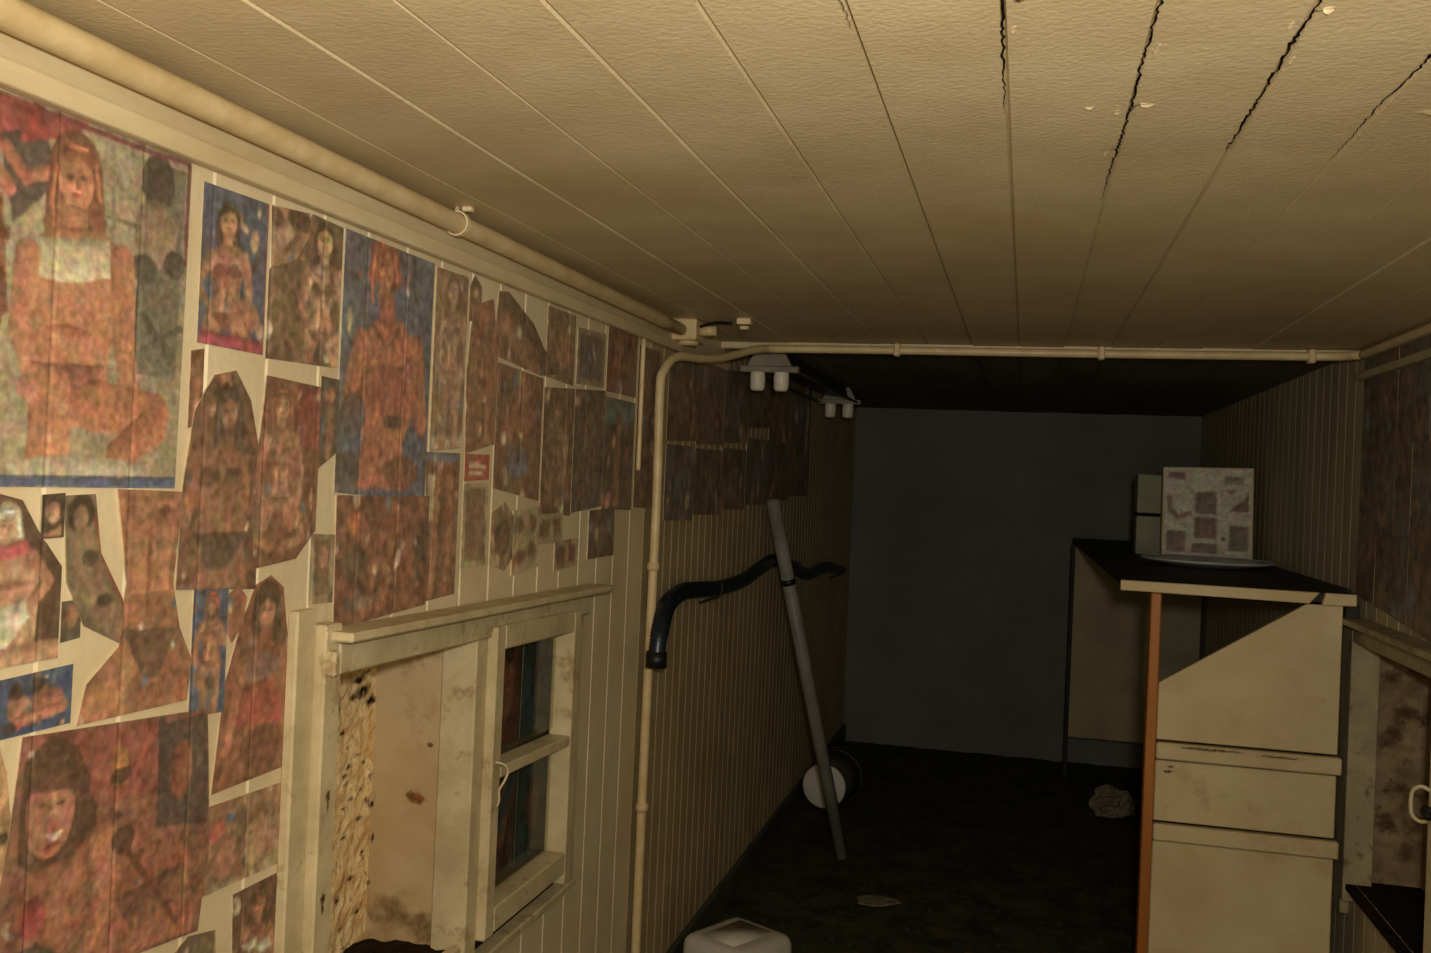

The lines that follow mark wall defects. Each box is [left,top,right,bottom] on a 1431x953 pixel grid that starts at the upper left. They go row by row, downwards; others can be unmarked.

crack [1000,0,1018,112]
crack [1101,0,1164,199]
crack [1225,0,1336,149]
crack [1334,54,1431,156]